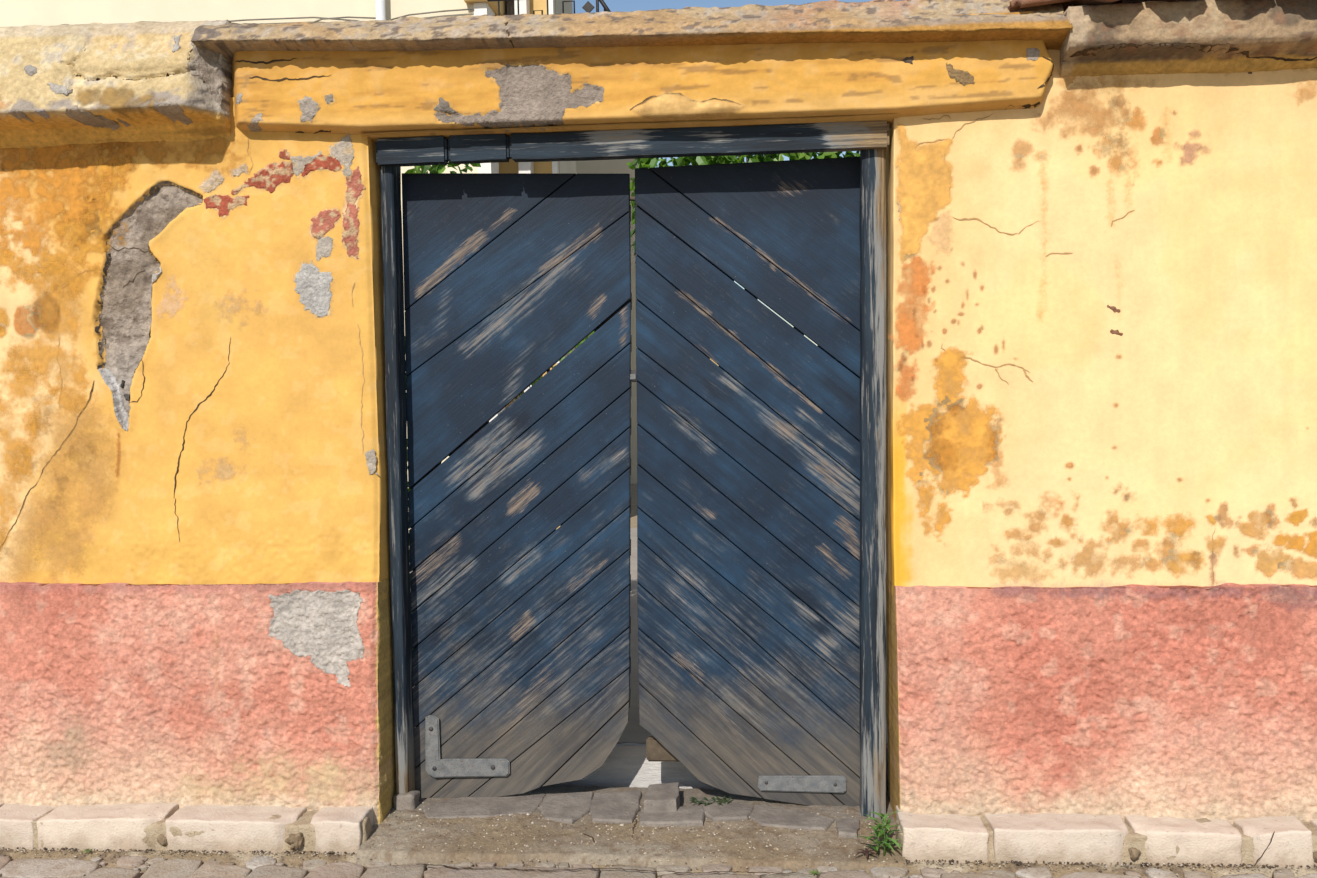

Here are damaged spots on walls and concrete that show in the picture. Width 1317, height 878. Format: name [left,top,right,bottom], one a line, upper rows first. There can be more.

peeling [433,62,604,131]
crack [1,335,94,546]
crack [174,337,231,542]
spalling [95,134,365,431]
crack [941,345,1033,383]
crack [953,217,1038,235]